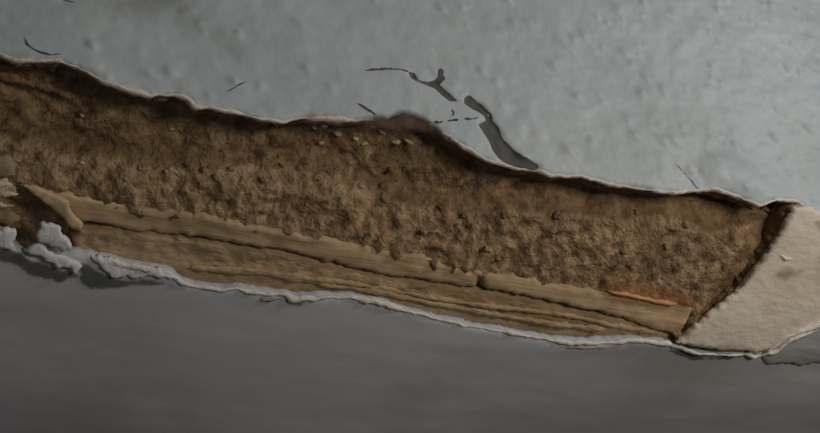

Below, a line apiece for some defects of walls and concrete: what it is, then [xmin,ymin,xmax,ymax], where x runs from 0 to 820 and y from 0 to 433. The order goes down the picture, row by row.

spalling [0,52,820,366]
crack [365,68,539,170]